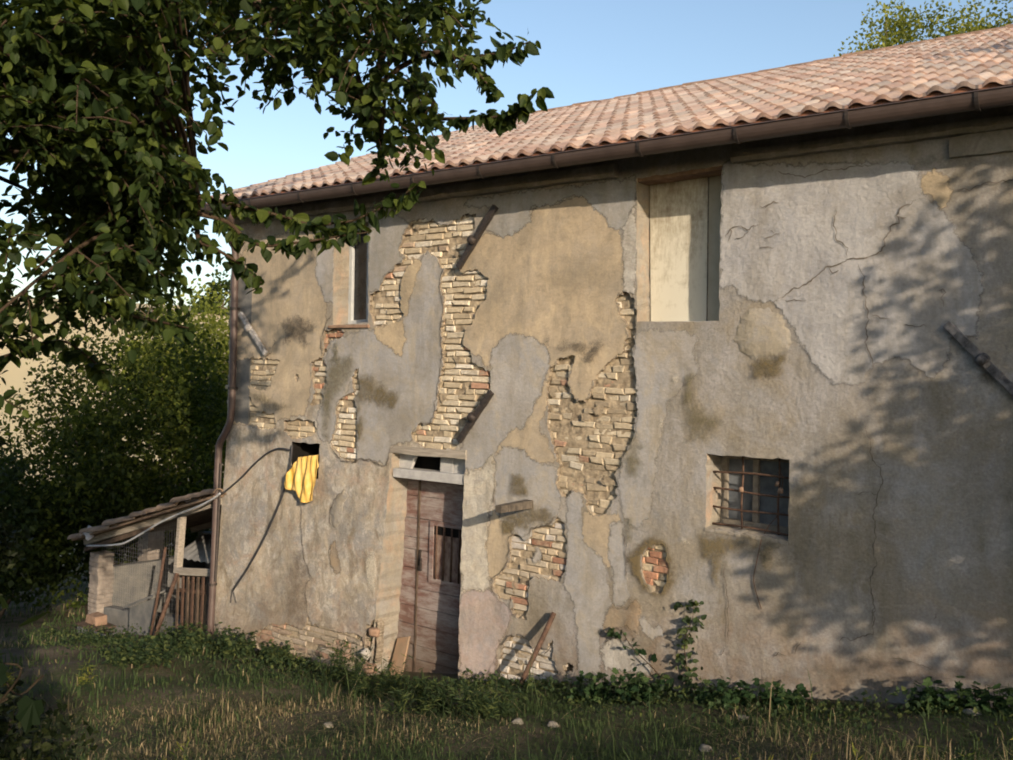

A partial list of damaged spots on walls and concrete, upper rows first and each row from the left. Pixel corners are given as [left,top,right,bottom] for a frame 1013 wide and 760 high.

crack [725,201,780,249]
peeling [921,168,953,209]
crack [782,200,924,372]
peeling [225,230,346,443]
spalling [330,368,360,464]
peeling [369,196,640,681]
spalling [641,544,670,594]
crack [837,426,885,651]
spalling [246,617,385,672]